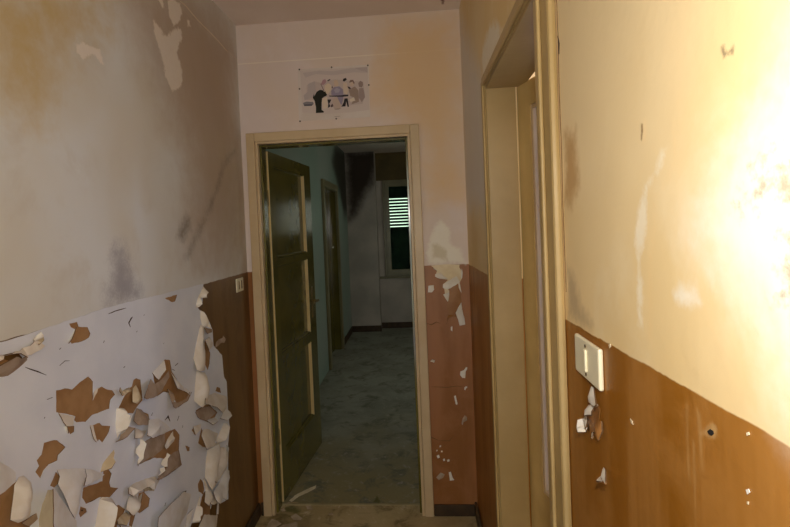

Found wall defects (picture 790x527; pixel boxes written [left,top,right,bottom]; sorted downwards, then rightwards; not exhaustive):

damp [0,0,251,361]
spalling [149,0,193,99]
damp [336,0,487,259]
spalling [423,214,469,331]
damp [628,0,790,527]
peeling [0,284,232,527]
peeling [576,386,603,440]